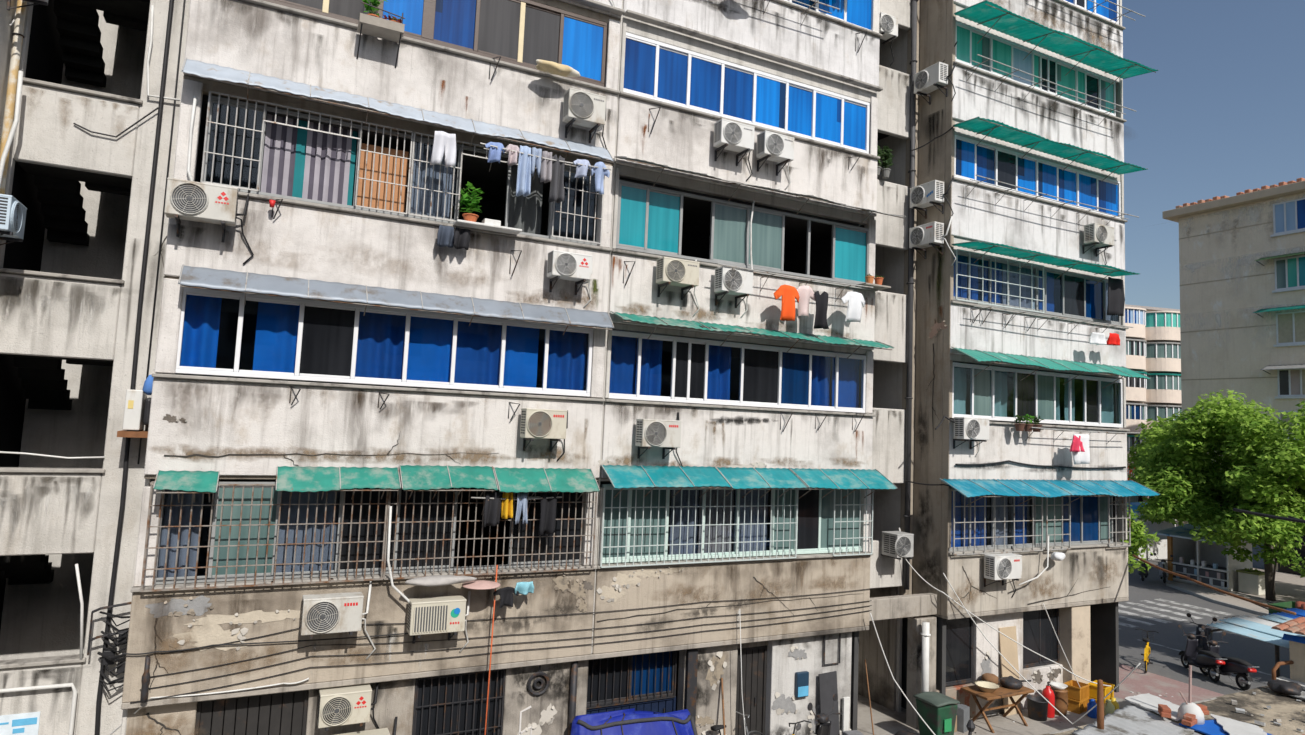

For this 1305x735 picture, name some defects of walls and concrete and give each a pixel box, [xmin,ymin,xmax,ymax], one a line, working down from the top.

damp [1025,0,1120,49]
damp [1037,97,1120,137]
damp [3,280,38,309]
damp [41,477,89,511]
peeling [145,595,302,652]